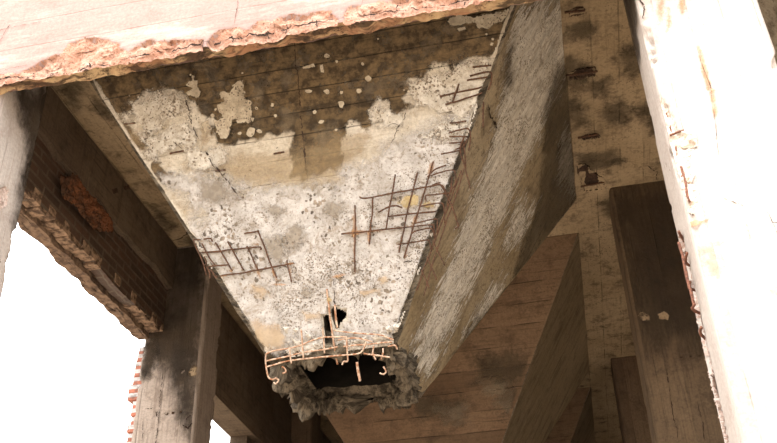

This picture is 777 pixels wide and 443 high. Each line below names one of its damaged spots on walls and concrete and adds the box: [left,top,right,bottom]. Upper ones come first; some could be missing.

peeling [186,74,201,98]
peeling [202,72,262,139]
crack [0,0,469,193]
spalling [0,0,509,86]
damp [604,102,655,134]
damp [622,46,640,80]
spalling [60,172,114,233]
damp [89,0,624,386]
rust [401,195,434,208]
rust [252,321,284,347]
spalling [282,289,405,364]